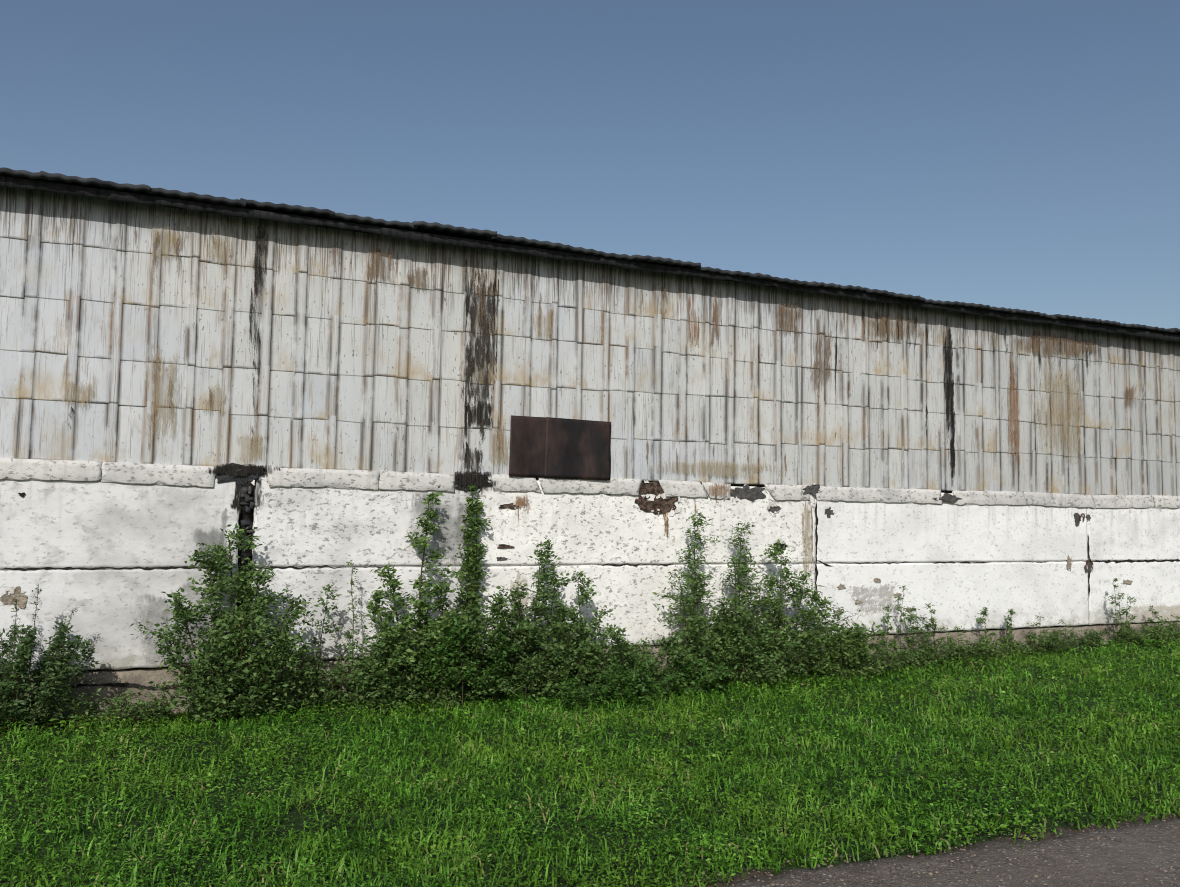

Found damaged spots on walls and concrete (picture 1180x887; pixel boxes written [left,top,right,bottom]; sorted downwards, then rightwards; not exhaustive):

damp [249,226,268,443]
damp [463,259,499,463]
damp [862,310,928,349]
damp [943,319,956,459]
corrosion [1008,351,1020,477]
corrosion [1035,332,1088,464]
peeling [639,480,682,516]
spalling [730,484,781,513]
spalling [0,586,27,611]